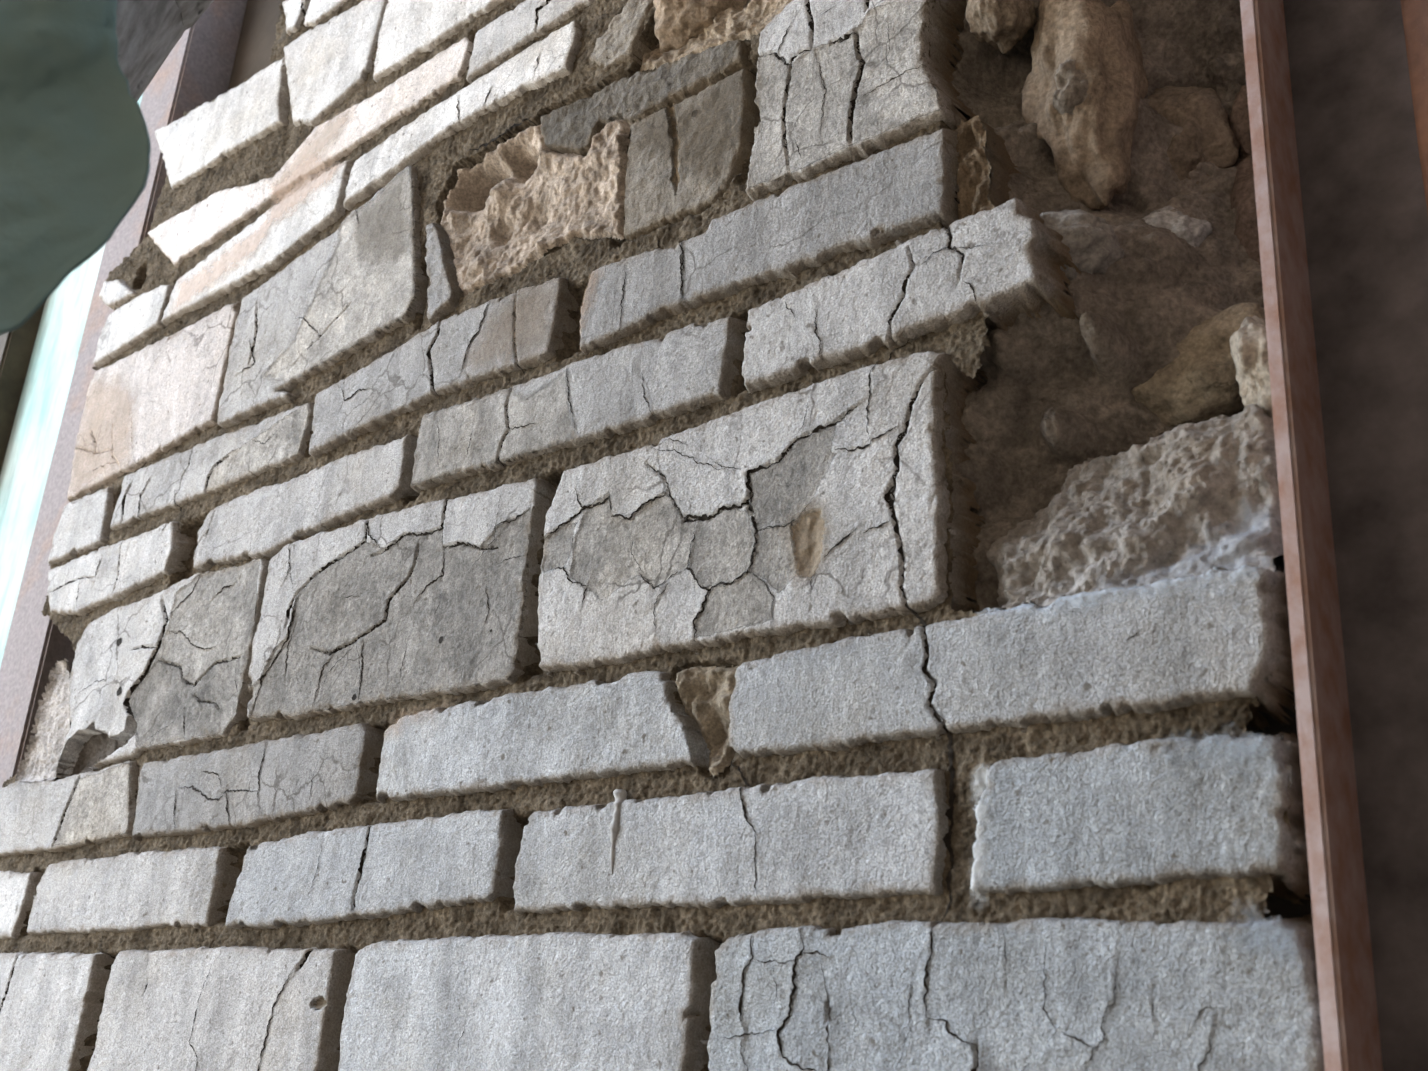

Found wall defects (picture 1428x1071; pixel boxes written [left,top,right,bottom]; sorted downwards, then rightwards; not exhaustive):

spalling [640,0,793,71]
crack [763,0,941,164]
spalling [440,120,631,296]
spalling [956,115,994,220]
crack [56,551,121,600]
peeling [15,425,836,846]
crack [79,191,993,1071]
crack [1022,941,1119,1071]
crack [1191,1007,1227,1071]